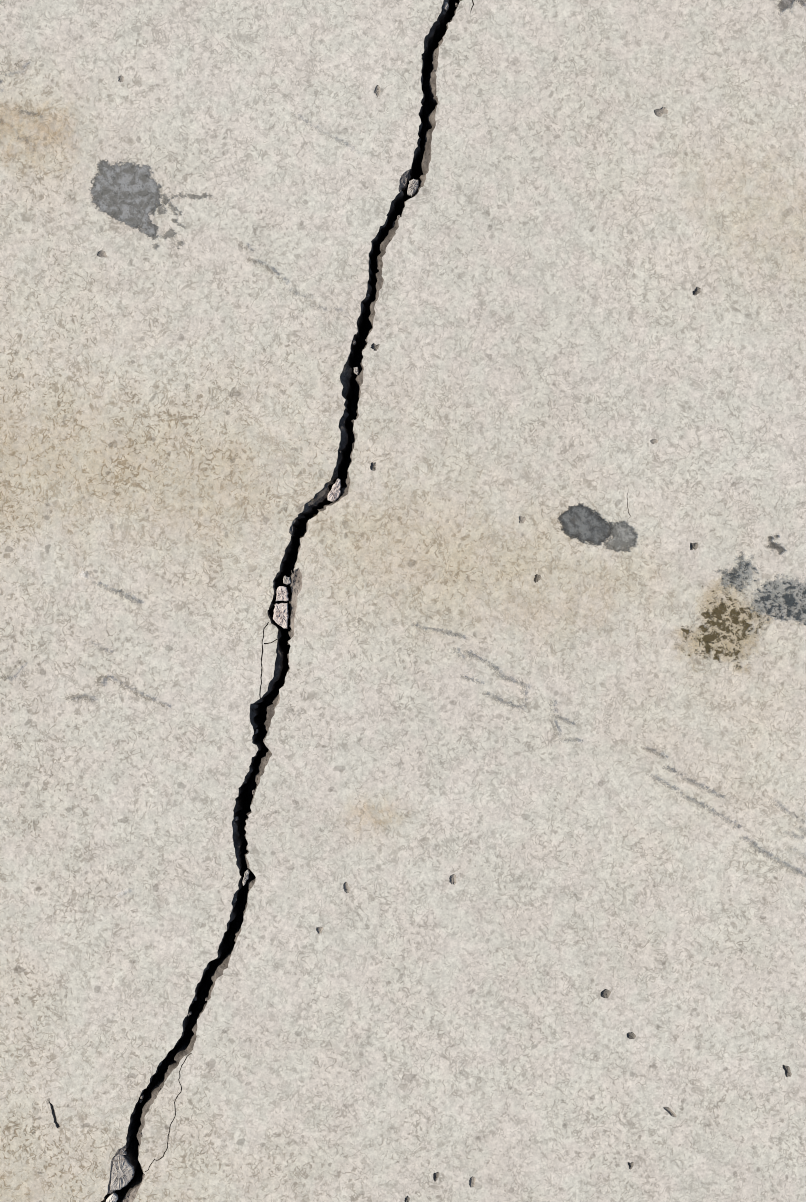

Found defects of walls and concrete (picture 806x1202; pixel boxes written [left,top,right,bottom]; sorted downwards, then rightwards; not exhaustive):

crack [101,0,474,1202]